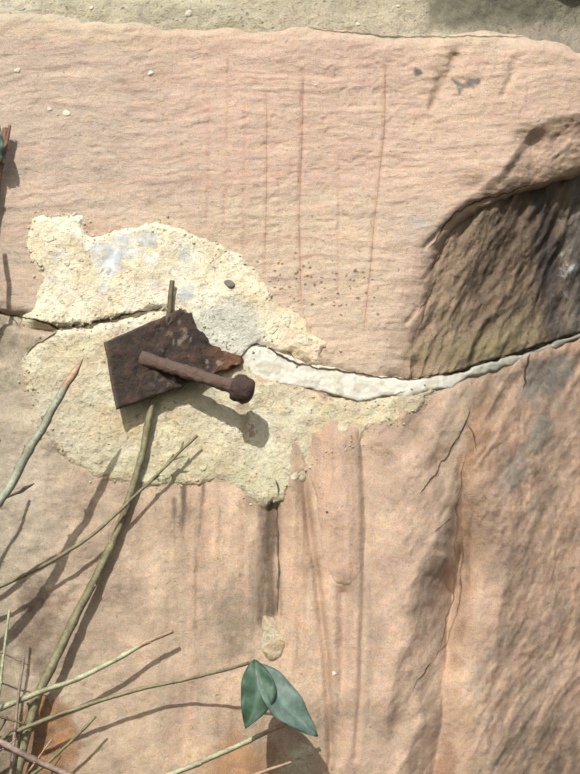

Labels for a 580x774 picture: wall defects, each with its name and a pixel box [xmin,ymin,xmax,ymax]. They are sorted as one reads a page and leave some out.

crack [0,307,162,355]
peeling [18,175,580,511]
crack [241,331,580,402]
water stain [265,502,276,615]
crack [413,412,476,691]